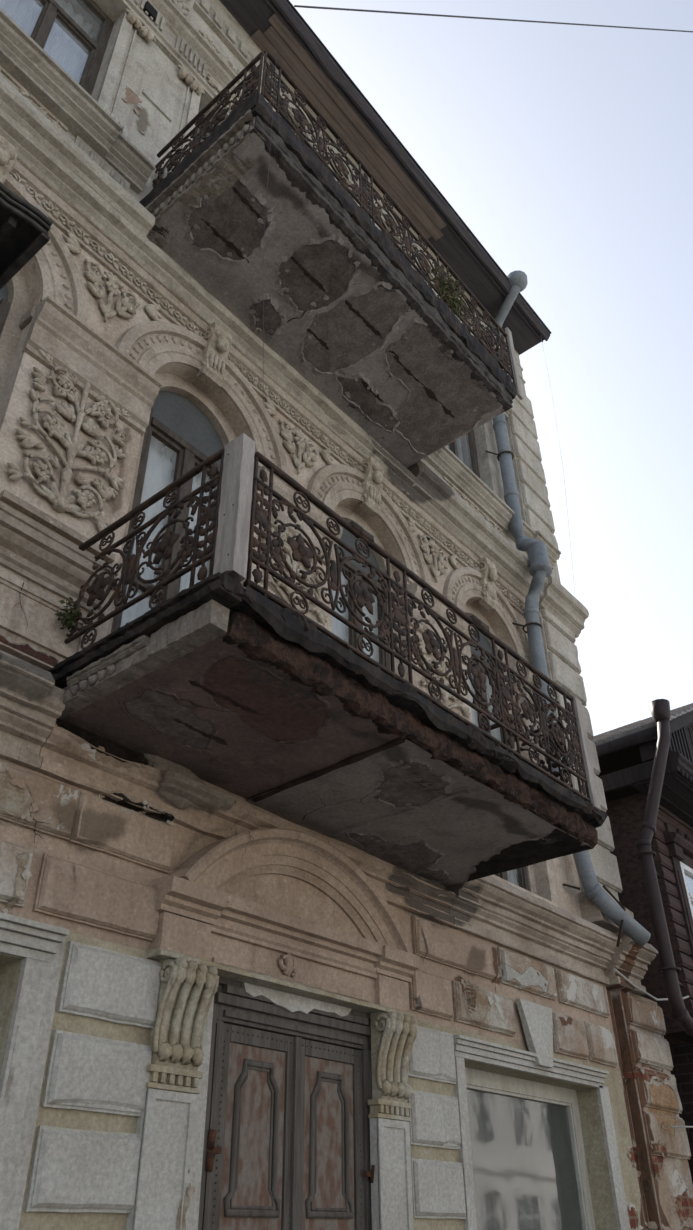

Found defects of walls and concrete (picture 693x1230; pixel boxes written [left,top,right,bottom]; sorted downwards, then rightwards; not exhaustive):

spalling [182,169,276,265]
spalling [248,234,504,457]
spalling [0,630,60,666]
spalling [621,1057,681,1181]
spalling [626,1185,693,1230]